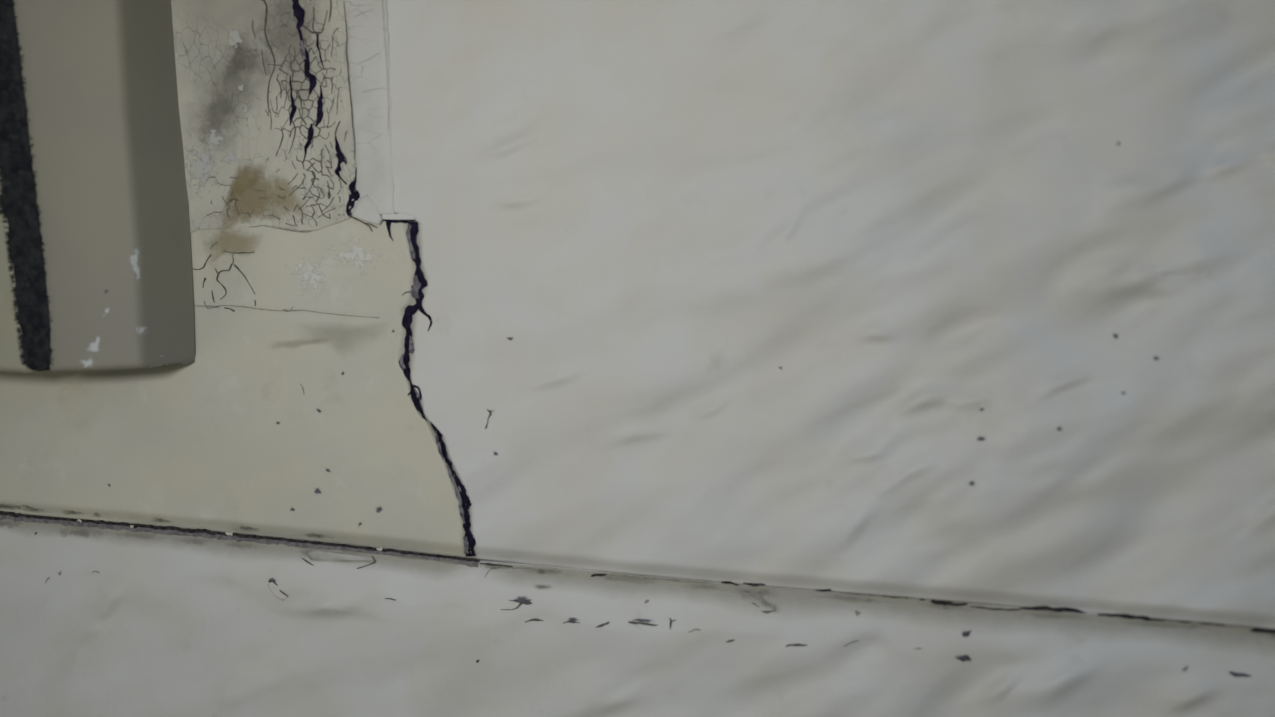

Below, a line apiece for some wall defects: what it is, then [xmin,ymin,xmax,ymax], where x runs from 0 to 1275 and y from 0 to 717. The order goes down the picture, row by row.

crack [192,0,476,556]